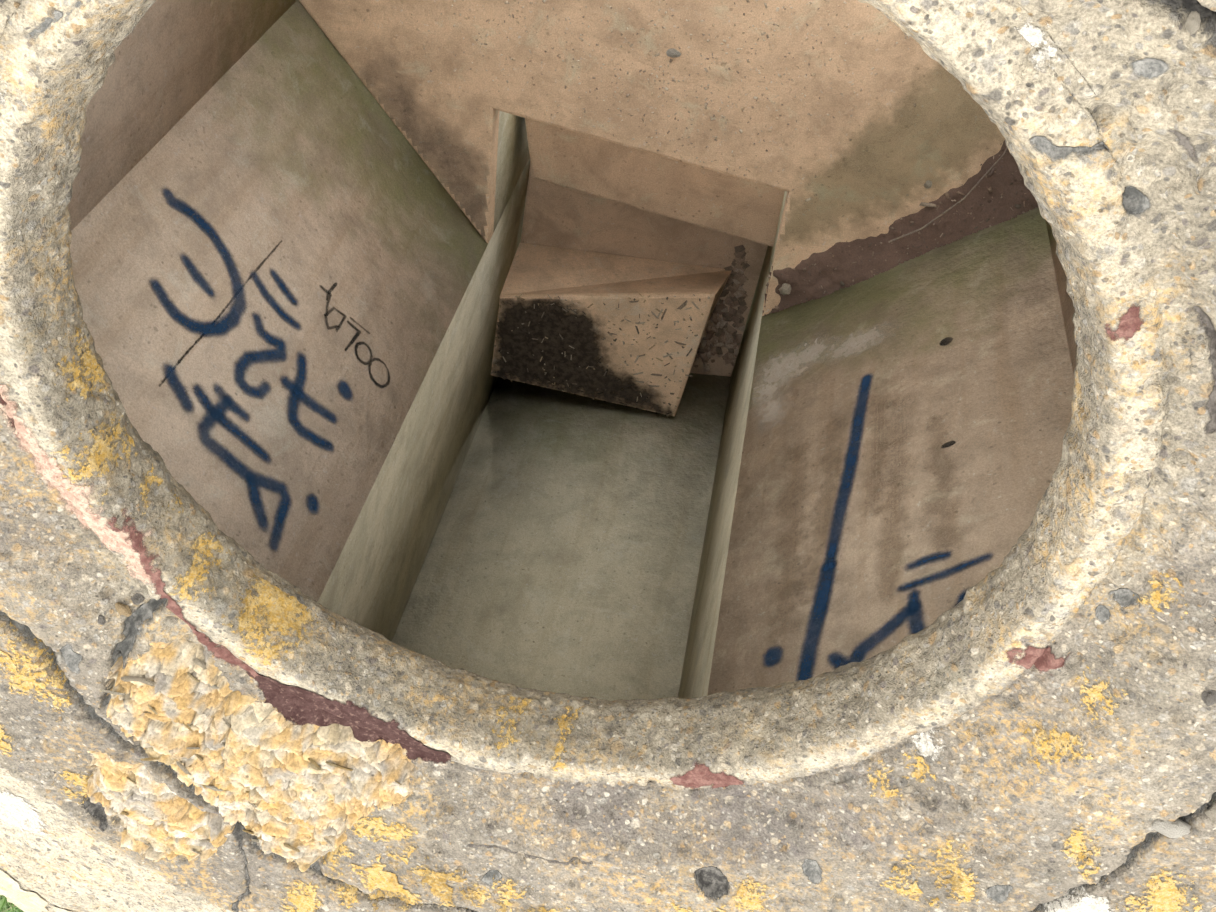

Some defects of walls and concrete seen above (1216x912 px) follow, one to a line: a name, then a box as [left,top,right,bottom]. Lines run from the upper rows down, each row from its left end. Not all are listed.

crack [1159,0,1216,51]
crack [159,240,282,387]
crack [97,587,178,627]
crack [0,610,202,796]
spalling [85,635,415,872]
crack [1201,690,1216,706]
crack [232,821,340,912]
crack [1032,792,1216,911]